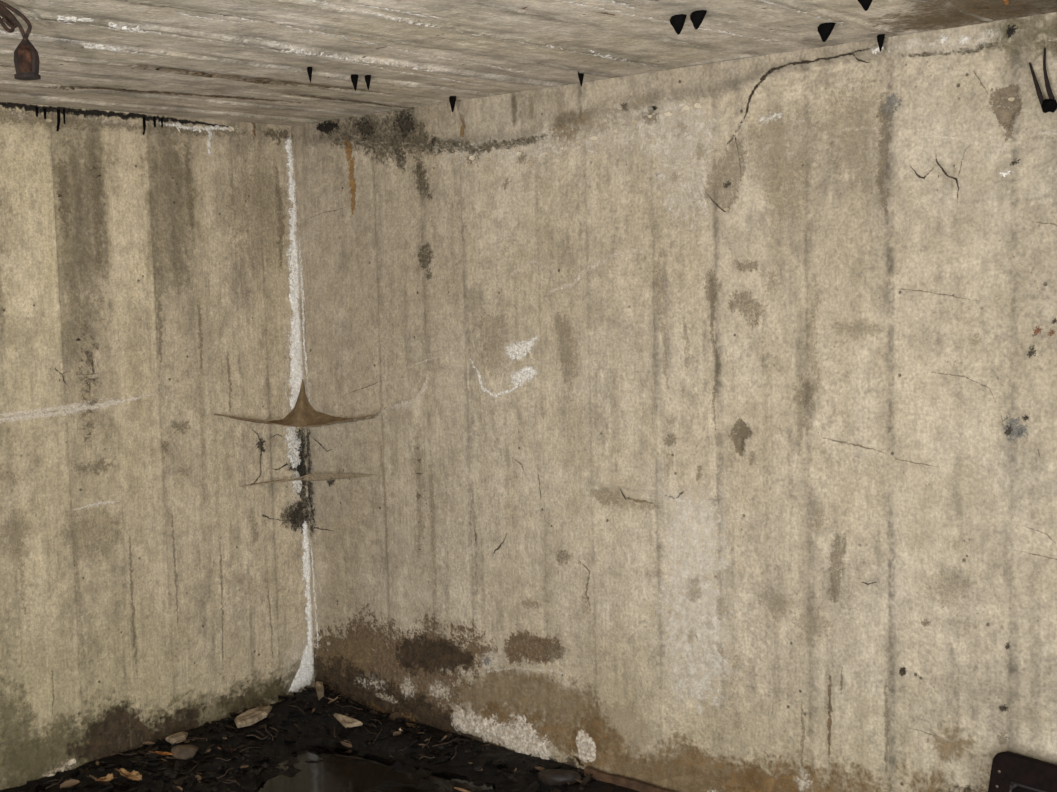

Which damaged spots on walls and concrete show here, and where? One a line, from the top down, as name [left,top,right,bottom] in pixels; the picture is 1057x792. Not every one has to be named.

water stain [0,30,587,198]
corrosion [343,140,356,215]
crack [727,41,886,180]
water stain [0,122,878,792]
water stain [914,773,971,792]
water stain [930,727,972,762]